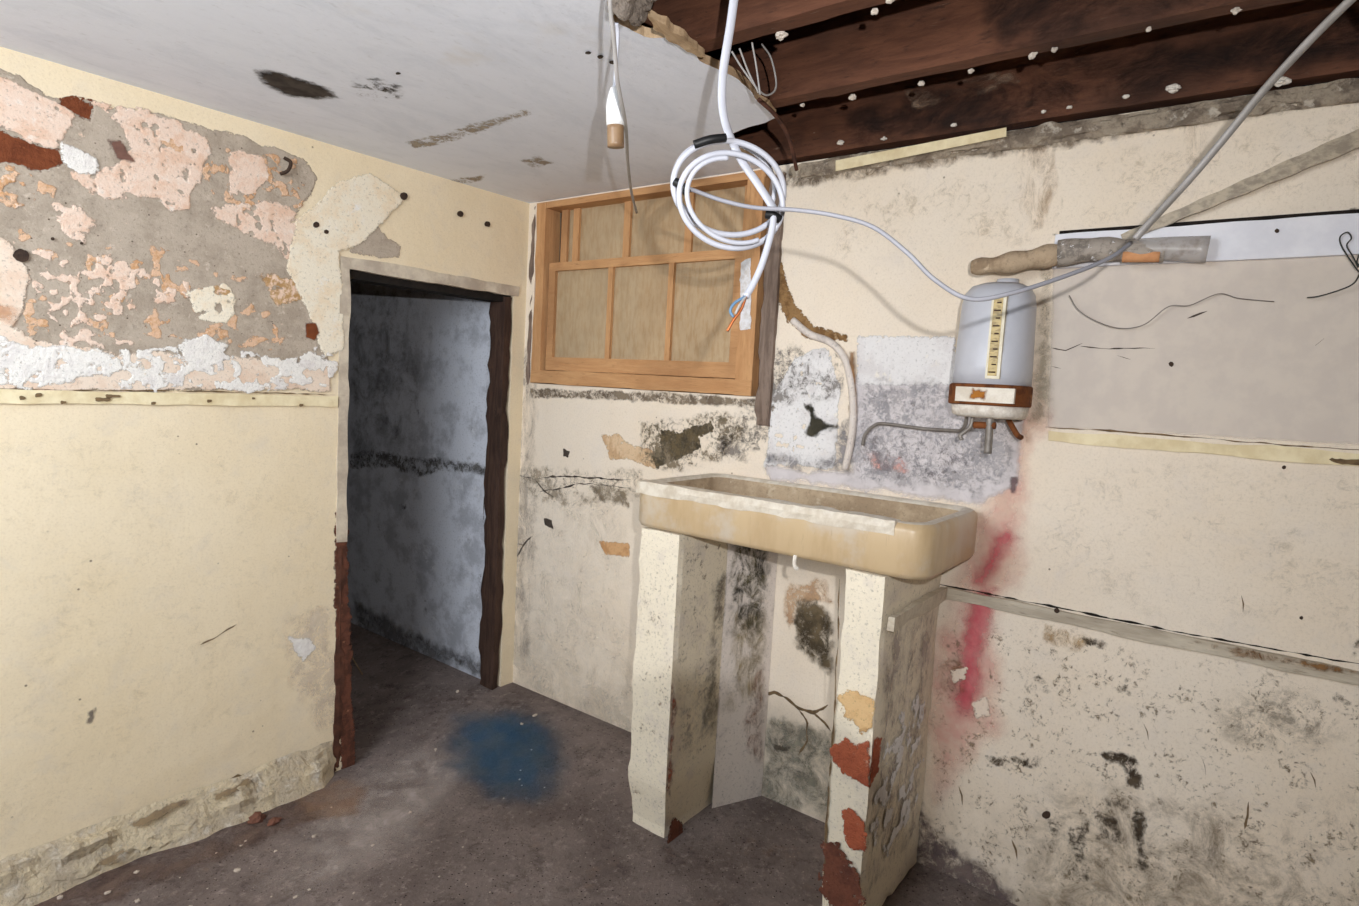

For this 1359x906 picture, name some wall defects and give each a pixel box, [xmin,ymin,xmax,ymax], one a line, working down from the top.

damp [259,71,336,100]
flaking render [0,69,329,363]
damp [642,350,1017,493]
damp [643,546,766,756]
damp [794,601,833,670]
flaking render [131,800,186,827]
flaking render [214,776,252,800]
damp [762,721,832,808]
spalling [818,690,925,906]
damp [881,620,1325,906]
damp [1292,824,1359,871]